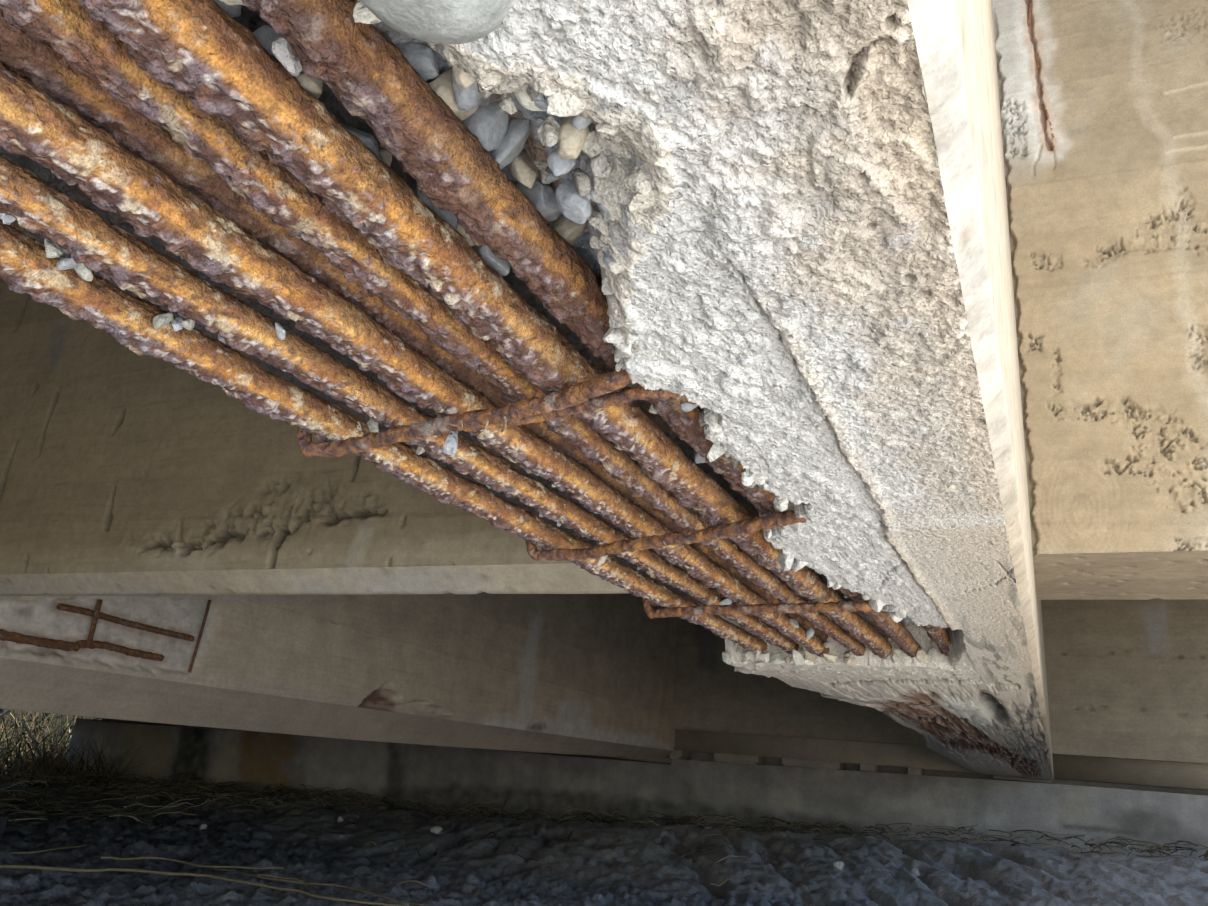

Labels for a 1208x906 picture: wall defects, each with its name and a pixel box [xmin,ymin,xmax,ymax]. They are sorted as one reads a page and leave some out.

rust [1002,0,1079,171]
spalling [0,0,967,679]
spalling [841,687,1044,778]